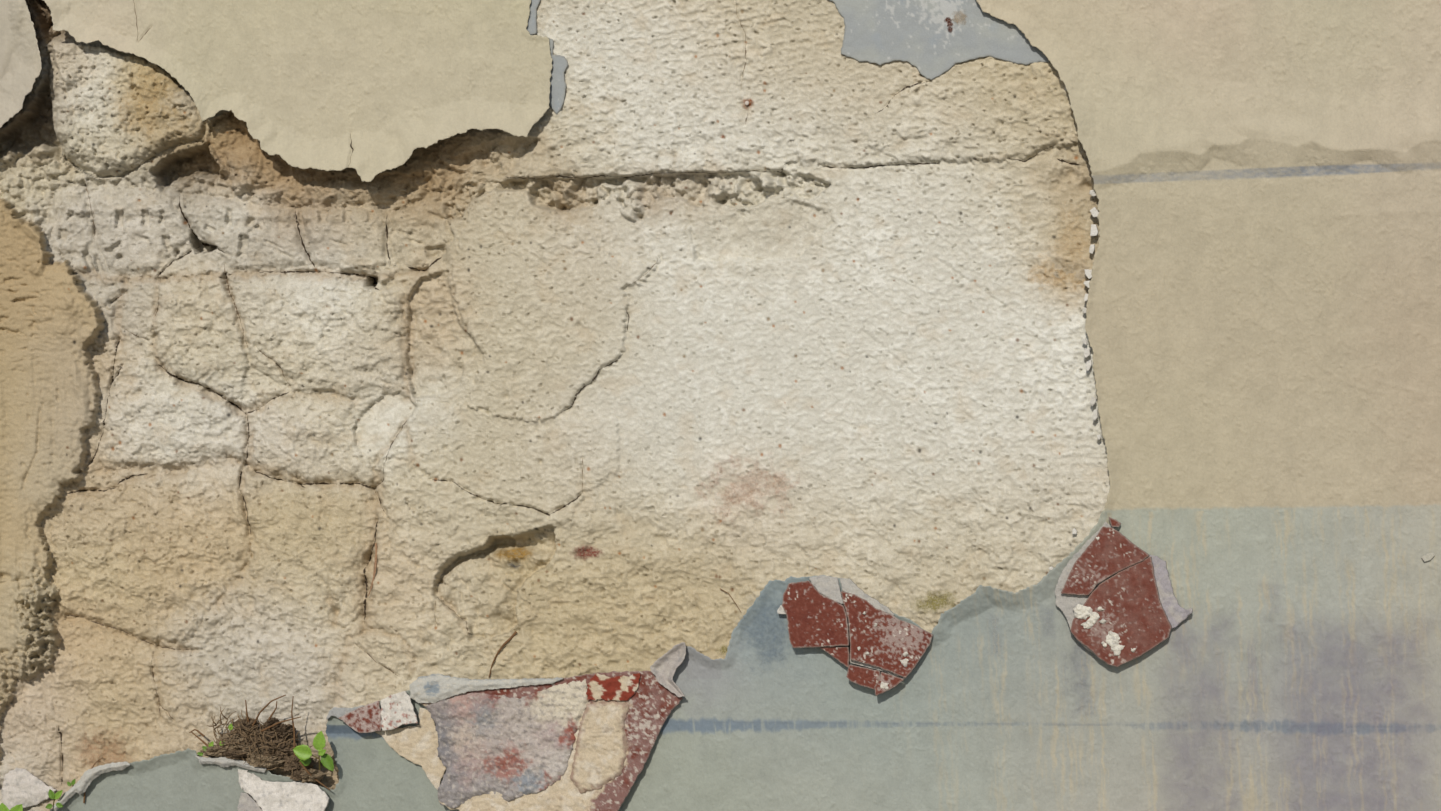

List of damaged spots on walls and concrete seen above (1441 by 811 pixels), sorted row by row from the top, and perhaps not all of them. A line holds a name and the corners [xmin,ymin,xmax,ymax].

crack [505,162,789,179]
crack [824,162,939,170]
crack [1012,146,1084,166]
crack [564,256,661,411]
crack [67,196,441,676]
crack [433,459,583,516]
peeling [0,0,1110,811]
peeling [777,517,1193,696]
crack [70,615,190,719]